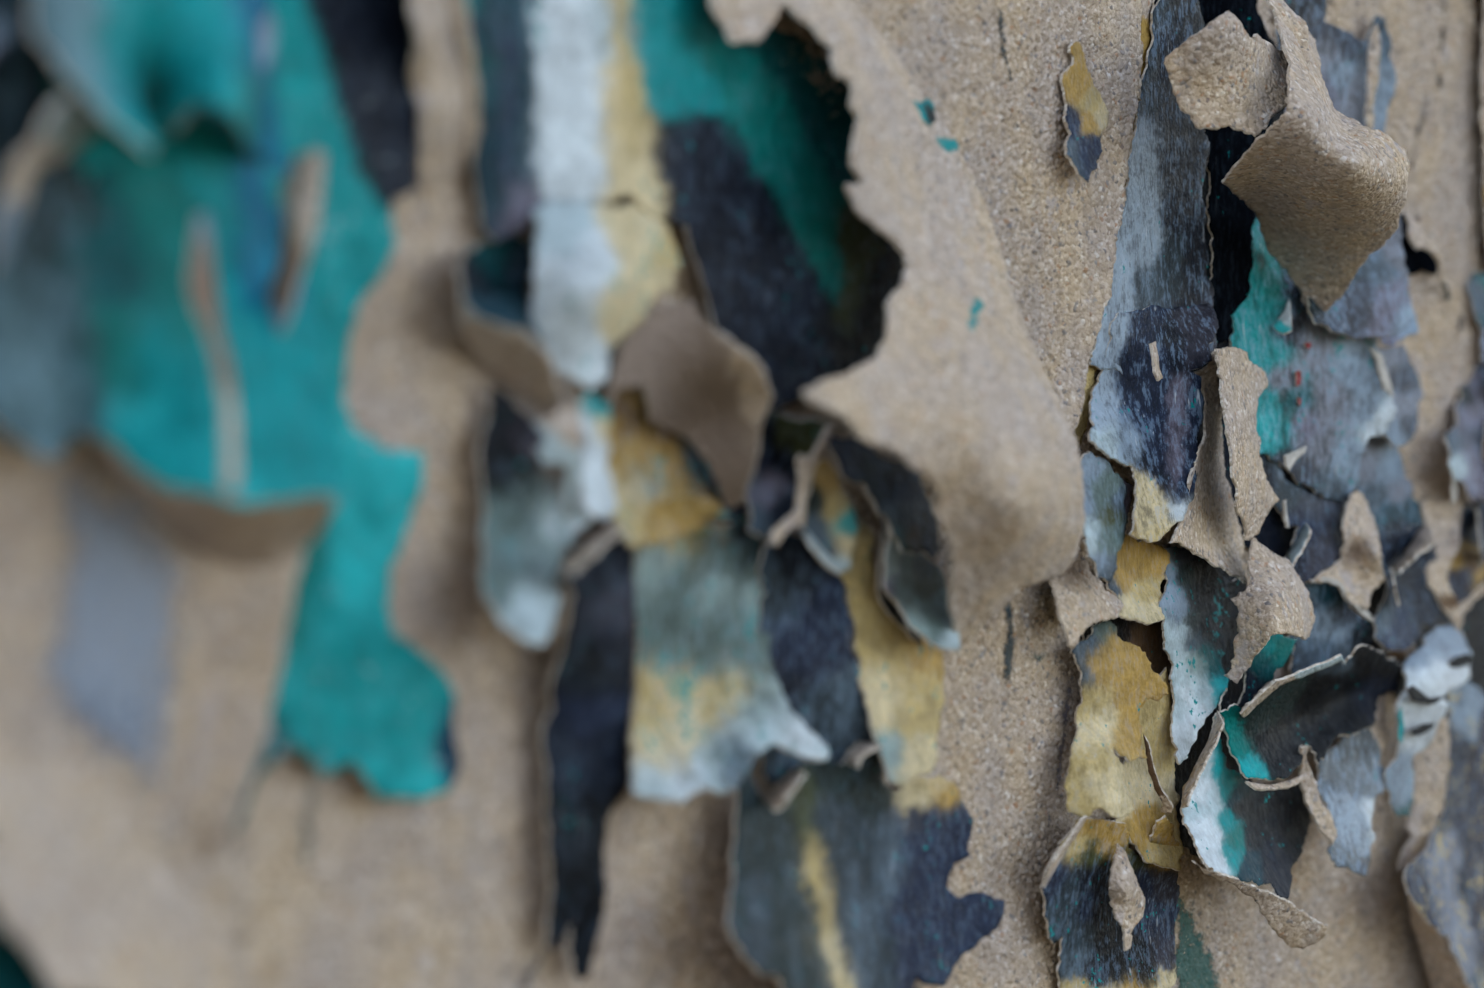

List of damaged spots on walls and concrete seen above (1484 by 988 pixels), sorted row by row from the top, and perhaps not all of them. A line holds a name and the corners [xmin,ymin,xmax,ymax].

peeling [0,0,1005,988]
peeling [708,0,1484,988]